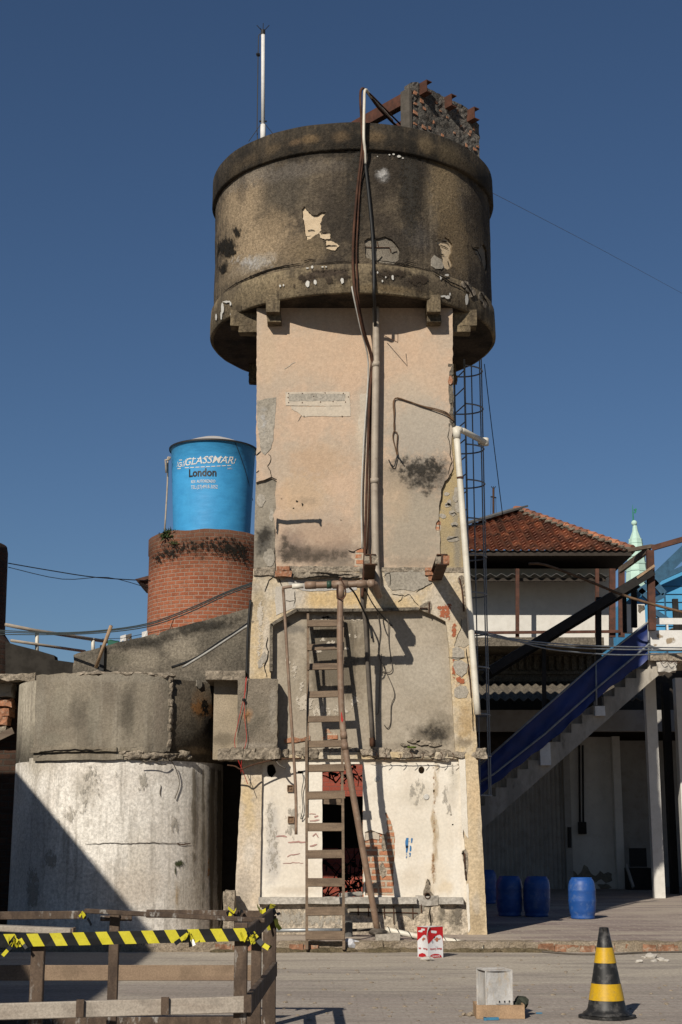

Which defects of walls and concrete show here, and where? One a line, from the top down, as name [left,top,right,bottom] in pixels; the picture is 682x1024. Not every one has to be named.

leakage [217,227,255,277]
flaking render [303,208,339,251]
flaking render [364,237,451,286]
flaking render [257,397,276,455]
flaking render [252,479,364,669]
leakage [282,536,343,562]
flaking render [383,567,436,591]
flaking render [435,364,474,731]
spalling [419,601,432,614]
flaking render [275,813,434,927]